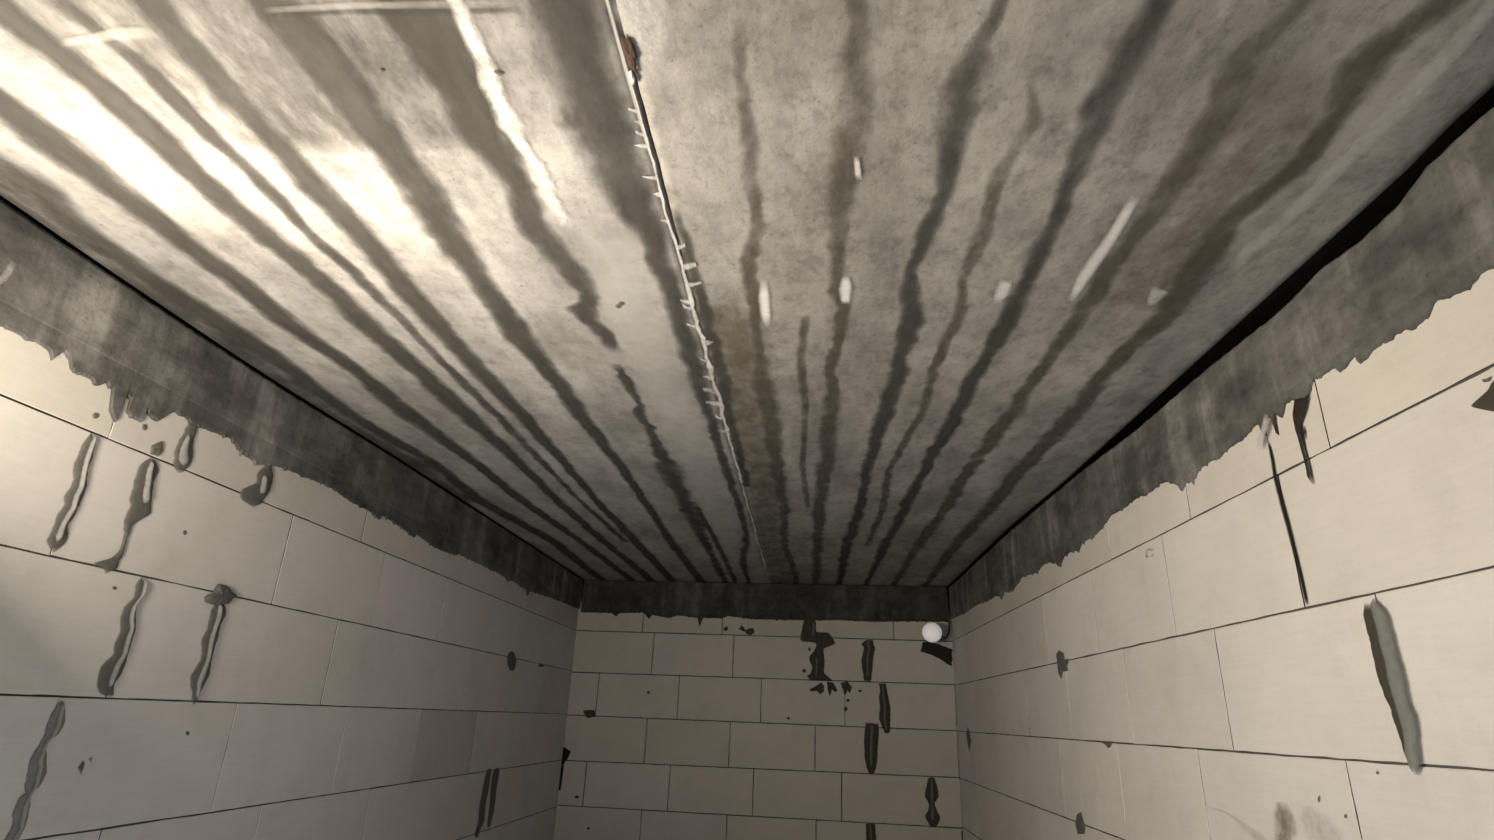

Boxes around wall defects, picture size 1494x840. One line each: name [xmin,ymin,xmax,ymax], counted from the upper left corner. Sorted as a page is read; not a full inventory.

damp [0,0,1219,586]
rust [620,36,637,85]
damp [922,0,1453,586]
crack [1268,444,1308,603]